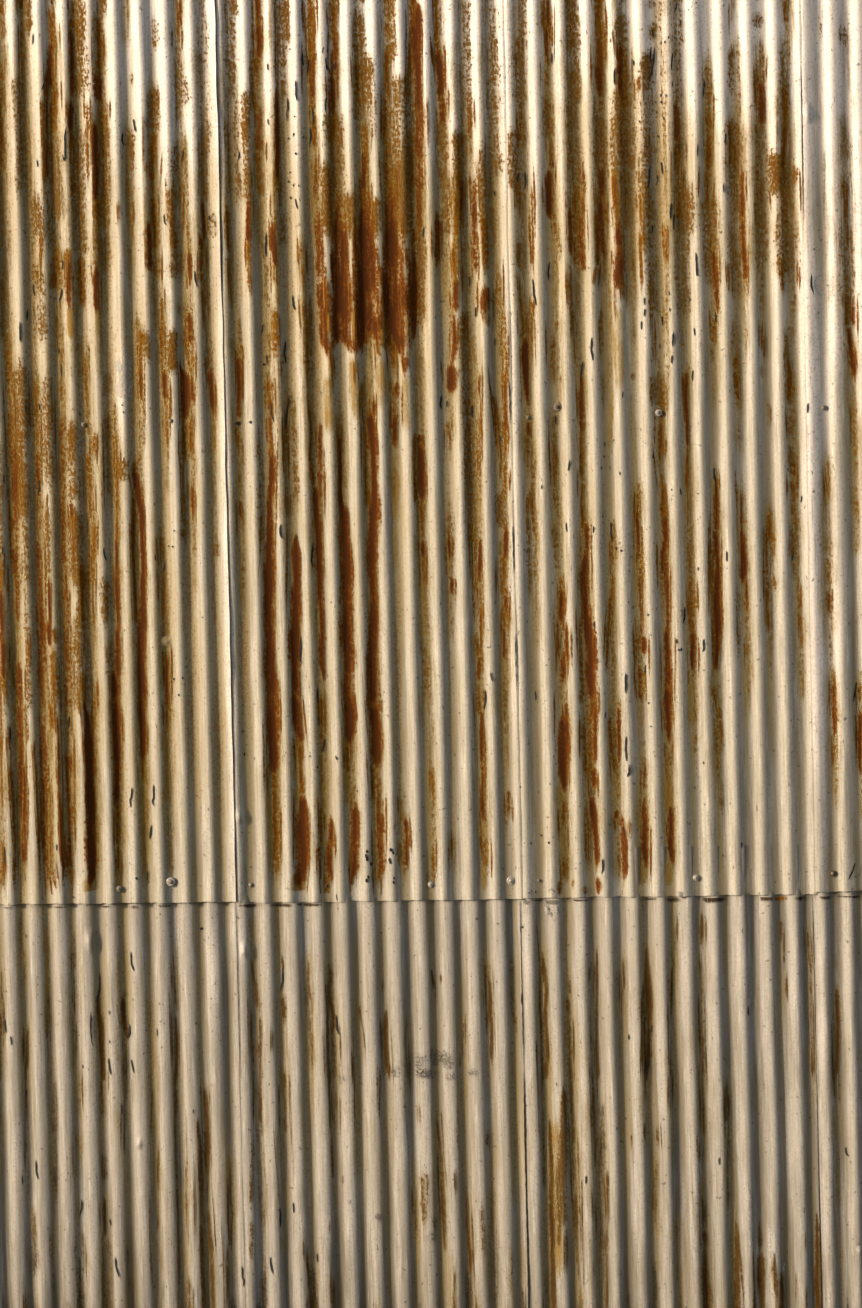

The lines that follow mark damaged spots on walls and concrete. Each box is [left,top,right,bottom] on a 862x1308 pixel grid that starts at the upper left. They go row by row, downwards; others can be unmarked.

rust [0,0,804,897]
rust [823,456,839,809]
rust [838,116,859,552]
leakage [733,1212,821,1308]